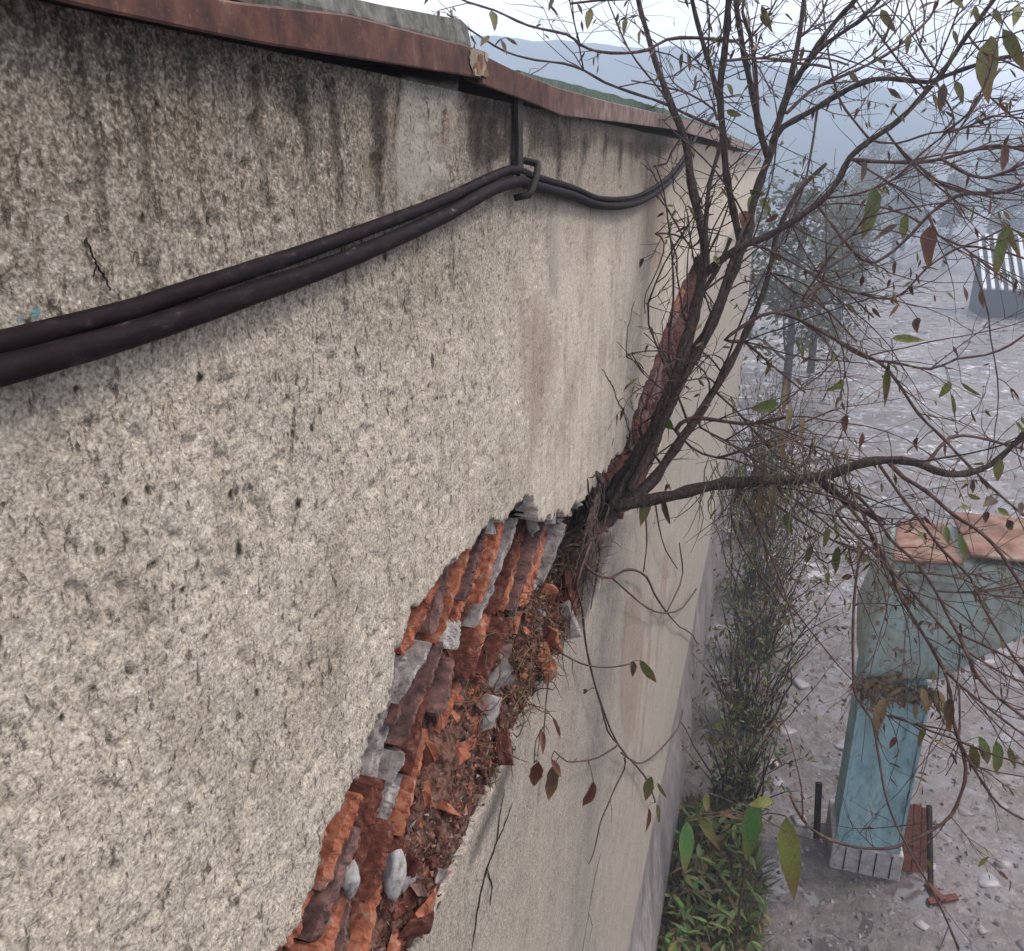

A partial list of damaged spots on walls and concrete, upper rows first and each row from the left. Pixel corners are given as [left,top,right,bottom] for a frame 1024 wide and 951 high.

leakage [326,79,344,230]
leakage [372,86,453,216]
leakage [466,98,512,167]
crack [86,237,111,291]
spalling [277,499,596,951]
crack [471,789,513,951]